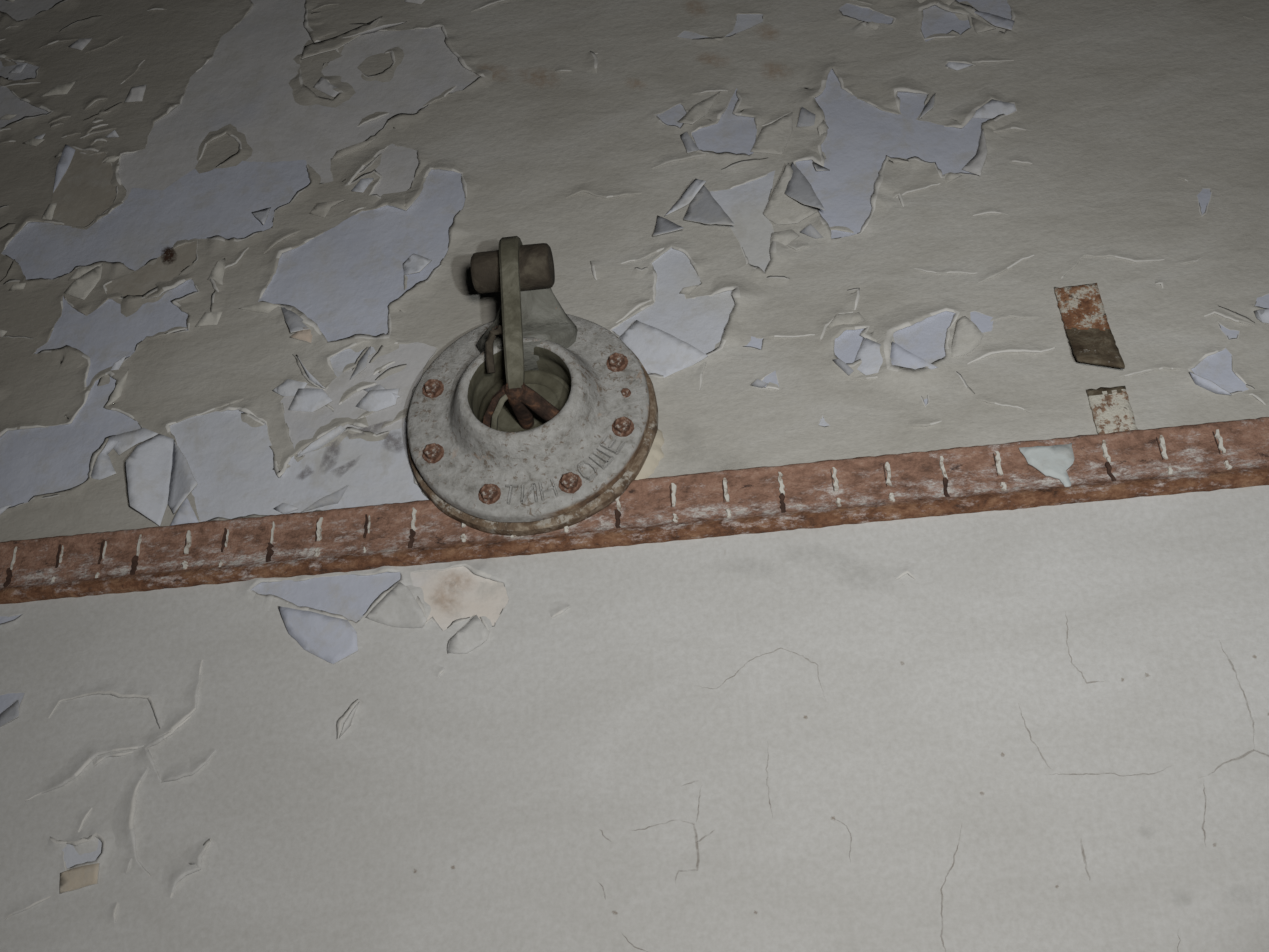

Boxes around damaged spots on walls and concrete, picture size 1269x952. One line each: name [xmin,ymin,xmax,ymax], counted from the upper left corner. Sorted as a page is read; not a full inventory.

peeling [833,0,1029,71]
peeling [0,0,500,526]
peeling [605,56,1055,426]
peeling [1201,289,1269,327]
peeling [1113,343,1269,405]
corrosion [0,417,1269,604]
peeling [235,558,516,678]
peeling [44,806,117,894]